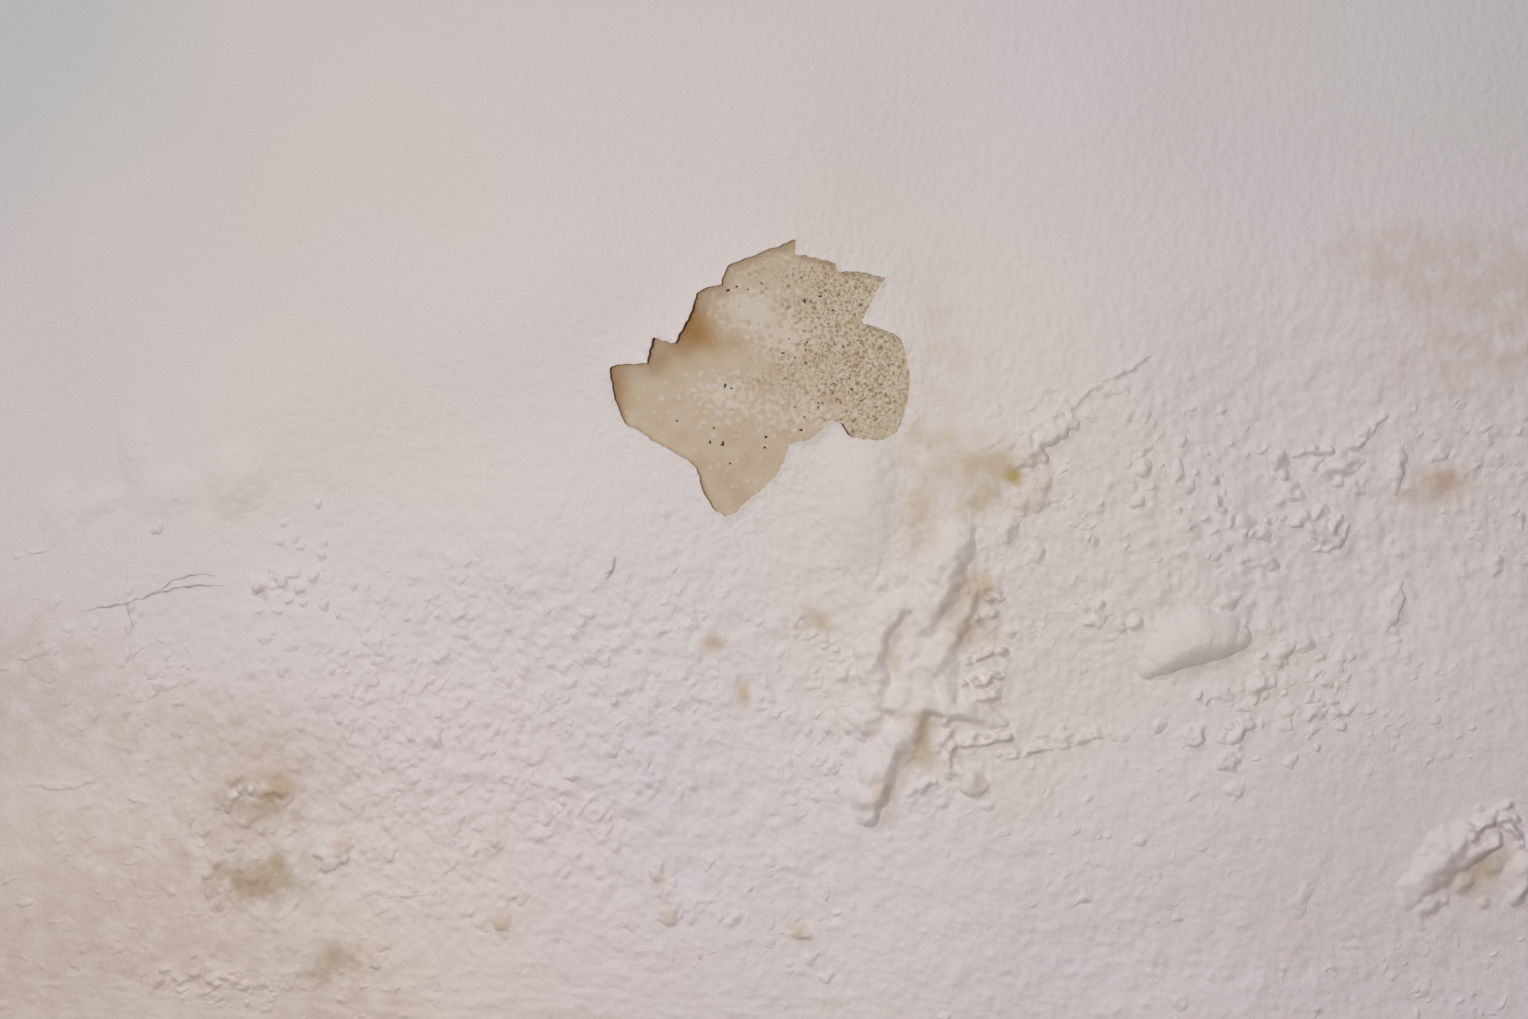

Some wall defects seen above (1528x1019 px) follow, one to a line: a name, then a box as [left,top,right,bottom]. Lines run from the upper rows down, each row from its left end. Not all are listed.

peeling [580,208,943,549]